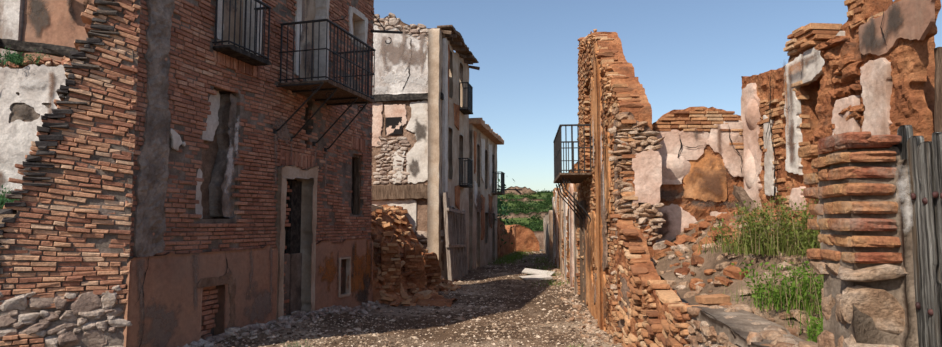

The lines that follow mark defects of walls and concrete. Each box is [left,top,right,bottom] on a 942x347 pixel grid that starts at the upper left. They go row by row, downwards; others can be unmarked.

spalling [10,92,52,123]
peeling [384,104,407,136]
peeling [392,150,406,184]
peeling [655,120,744,242]